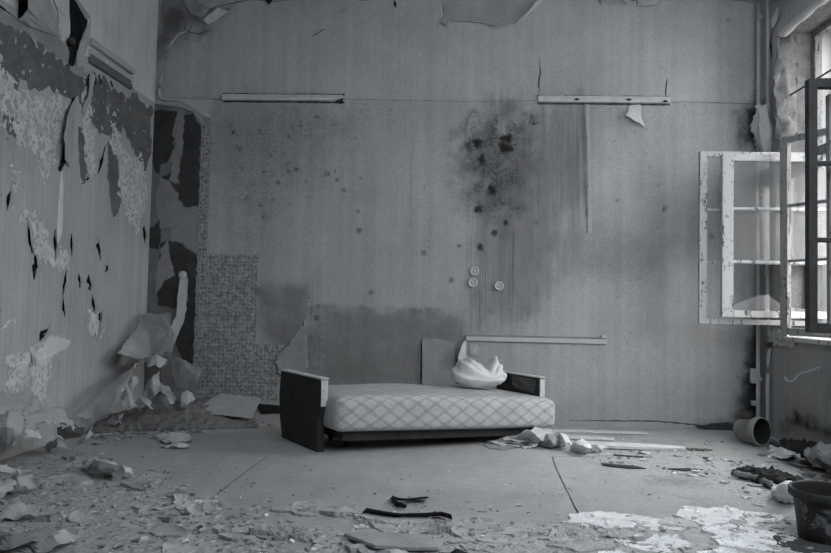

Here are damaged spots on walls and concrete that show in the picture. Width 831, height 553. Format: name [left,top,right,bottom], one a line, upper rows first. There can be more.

peeling [183,0,228,25]
peeling [441,0,543,29]
peeling [770,0,829,140]
peeling [0,0,212,365]
leakage [467,117,540,205]
peeling [3,329,70,402]
peeling [143,362,164,395]
peeling [275,319,309,375]